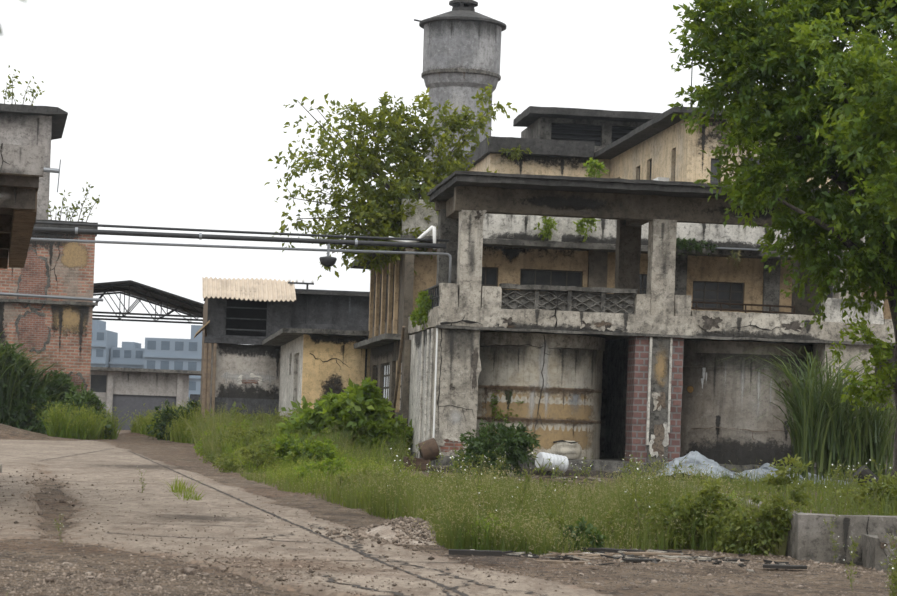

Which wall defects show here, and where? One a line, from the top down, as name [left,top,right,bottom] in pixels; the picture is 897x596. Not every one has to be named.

damp [51,305,89,356]
spalling [698,312,724,332]
spalling [780,321,804,335]
crack [437,292,585,447]
damp [481,343,597,450]